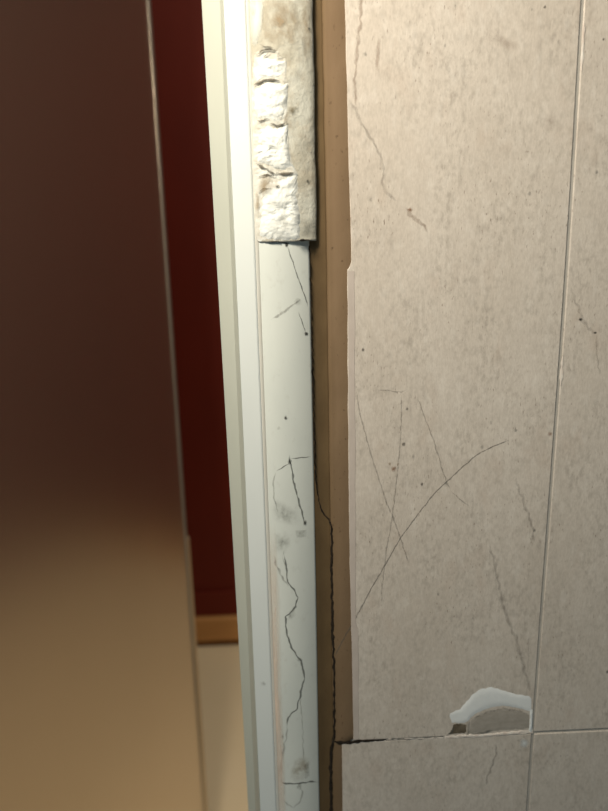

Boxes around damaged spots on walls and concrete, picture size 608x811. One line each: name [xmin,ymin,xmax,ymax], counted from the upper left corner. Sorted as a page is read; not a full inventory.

spalling [250,0,317,243]
crack [271,239,427,811]
spalling [444,687,533,737]